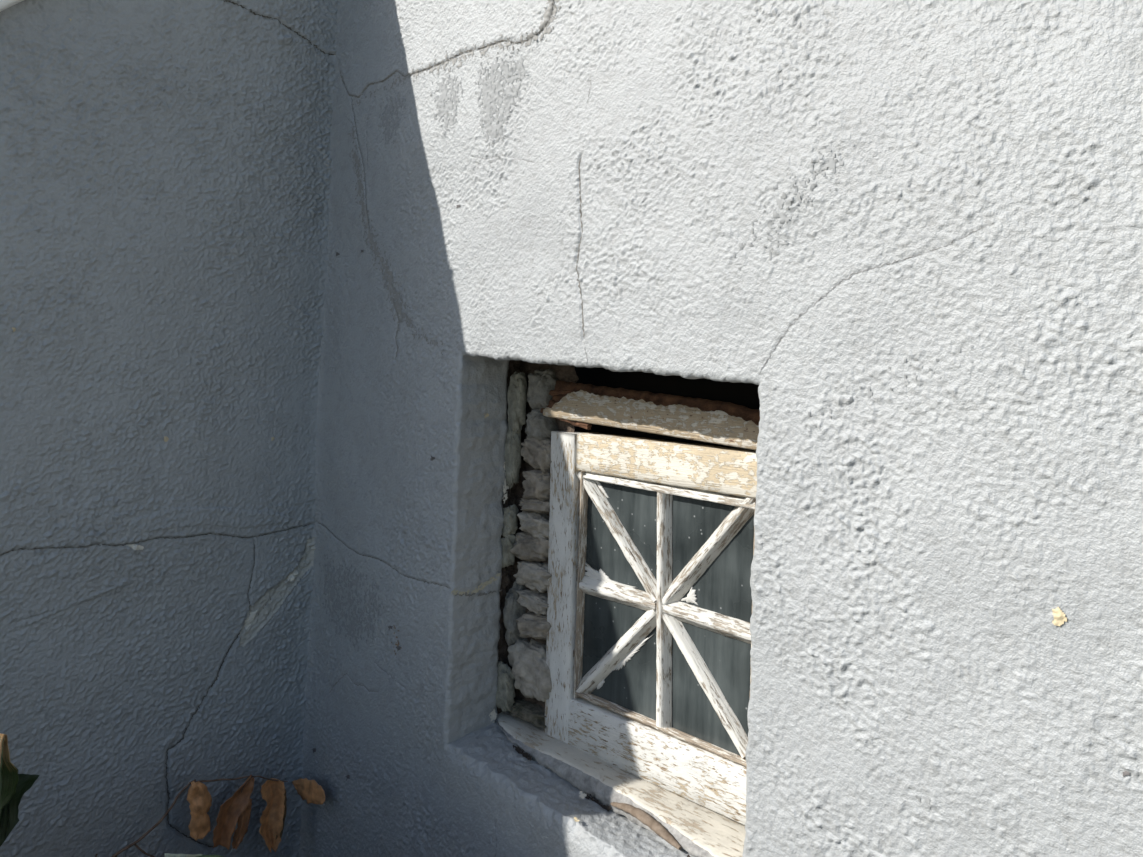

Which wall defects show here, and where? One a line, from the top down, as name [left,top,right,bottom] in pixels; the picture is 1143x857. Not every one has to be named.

crack [223,0,554,225]
crack [576,158,588,365]
crack [4,523,502,847]
spalling [239,537,316,647]
flaking render [489,661,515,723]